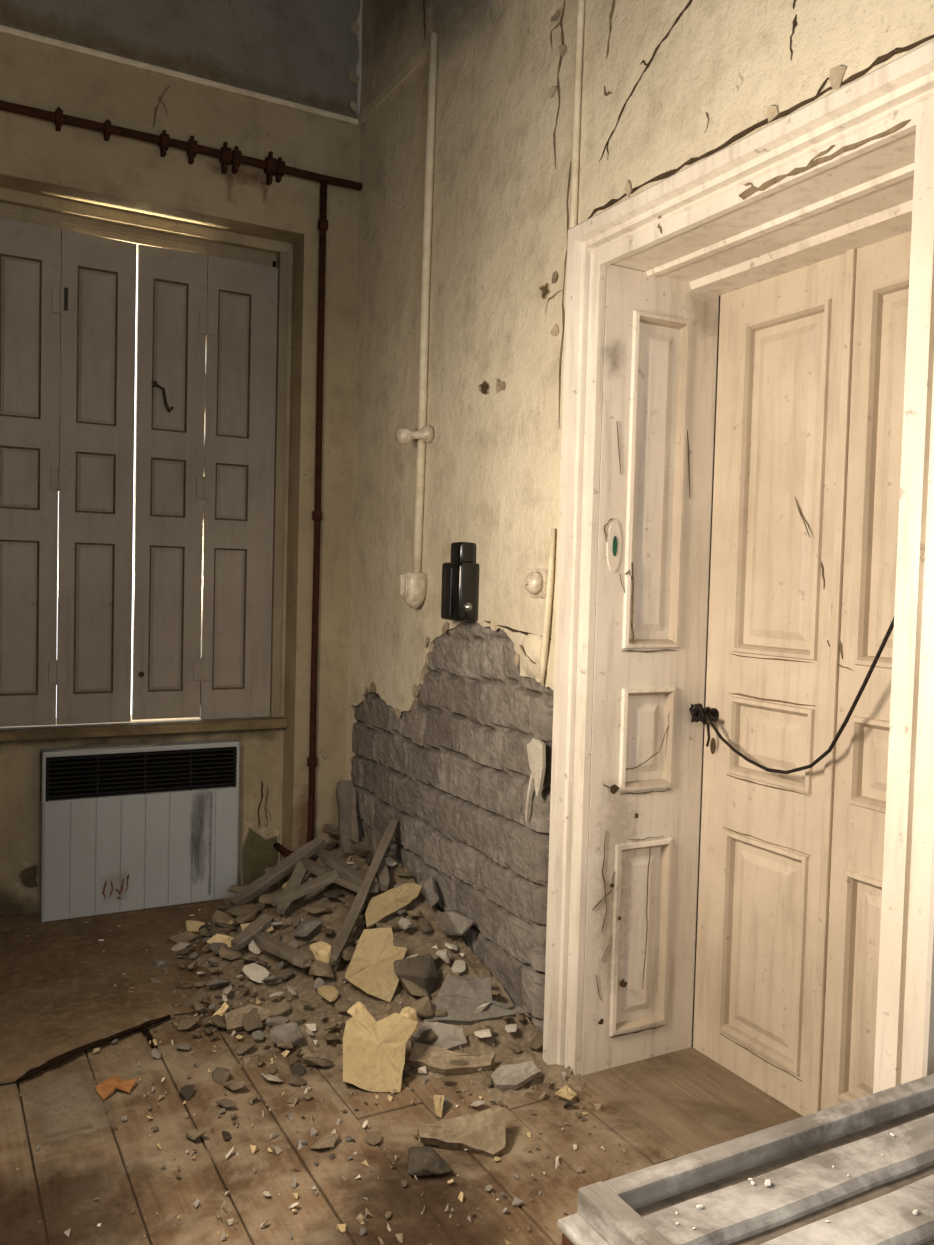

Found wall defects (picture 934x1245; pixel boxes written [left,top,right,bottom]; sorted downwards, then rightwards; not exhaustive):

crack [545,0,934,412]
spalling [351,620,554,1032]